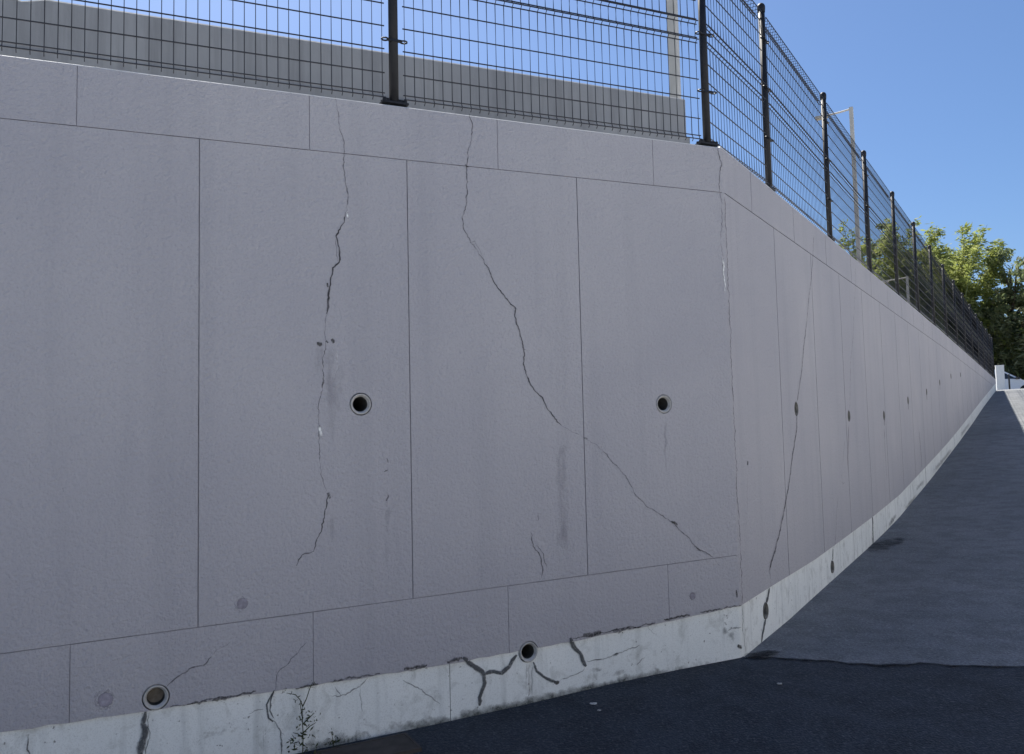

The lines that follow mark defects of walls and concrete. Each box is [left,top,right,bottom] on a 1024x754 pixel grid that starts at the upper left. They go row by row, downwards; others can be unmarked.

crack [326,191,348,314]
crack [462,114,562,426]
crack [718,152,797,643]
crack [296,493,329,566]
crack [260,645,304,753]
crack [533,662,559,685]